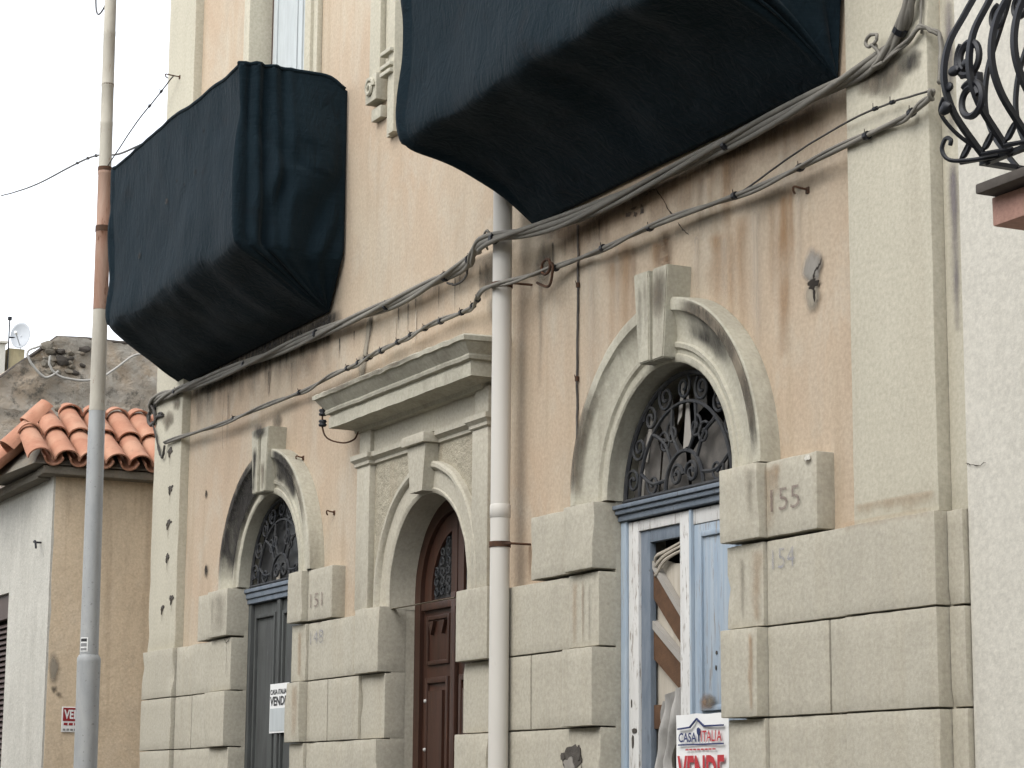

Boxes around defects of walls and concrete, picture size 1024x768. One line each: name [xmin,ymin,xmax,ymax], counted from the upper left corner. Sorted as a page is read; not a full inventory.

spalling [803,251,822,308]
water stain [254,416,280,437]
water stain [219,451,300,567]
spalling [560,744,582,768]